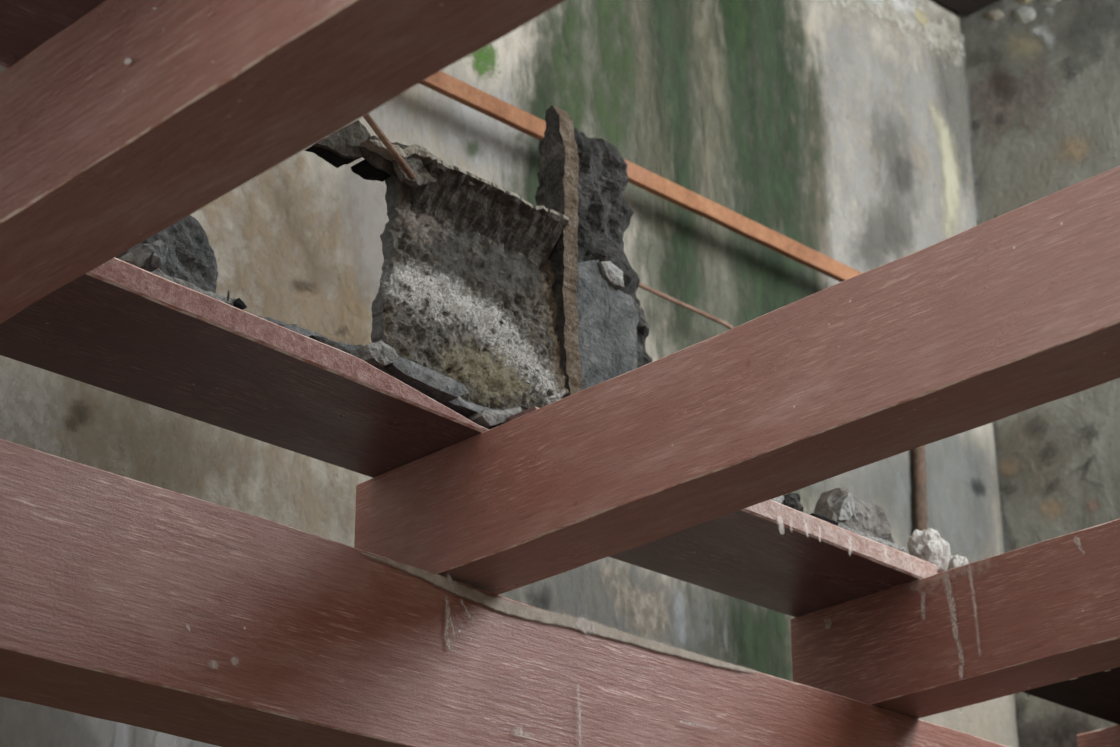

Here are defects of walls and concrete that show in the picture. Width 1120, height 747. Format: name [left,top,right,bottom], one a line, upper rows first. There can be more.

peeling [598,261,624,289]
damp [695,0,726,202]
damp [807,76,826,248]
damp [862,122,925,266]
damp [930,23,967,234]
damp [511,557,737,660]
damp [815,435,995,613]
damp [944,573,964,678]